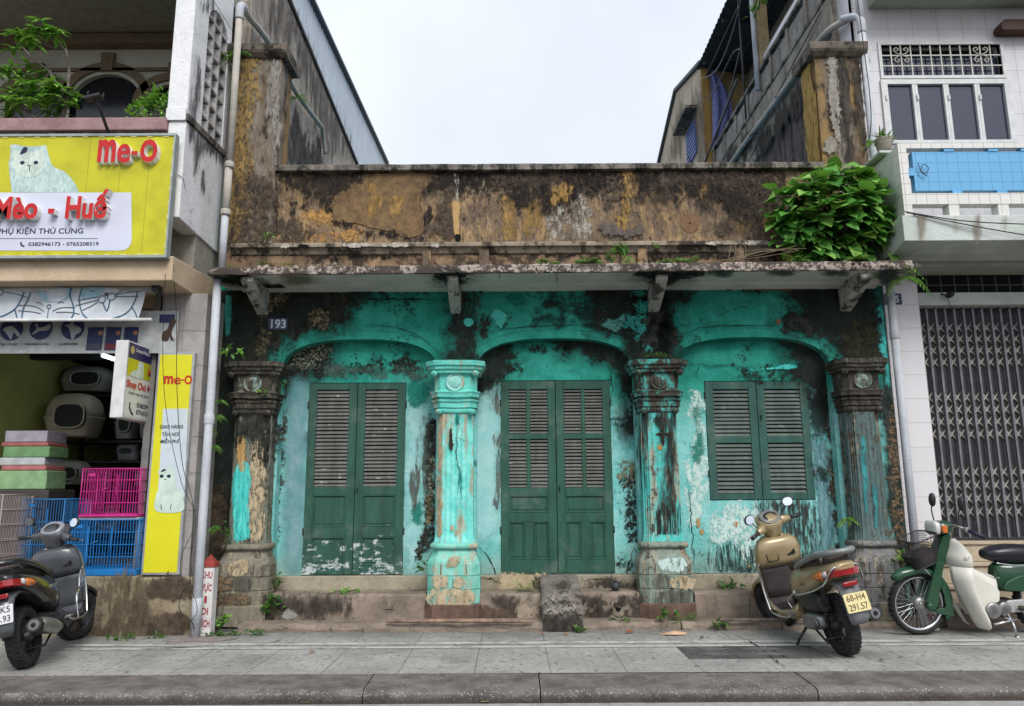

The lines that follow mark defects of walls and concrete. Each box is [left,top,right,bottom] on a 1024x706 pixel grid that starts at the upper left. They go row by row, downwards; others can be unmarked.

water stain [189,0,803,253]
peeling [541,191,595,241]
spalling [231,381,290,543]
water stain [208,274,428,561]
water stain [409,413,436,560]
peeling [436,414,458,541]
water stain [434,252,796,546]
peeling [691,407,705,464]
water stain [737,268,903,437]
water stain [72,564,194,637]
spalling [425,555,584,632]
spalling [653,557,696,604]